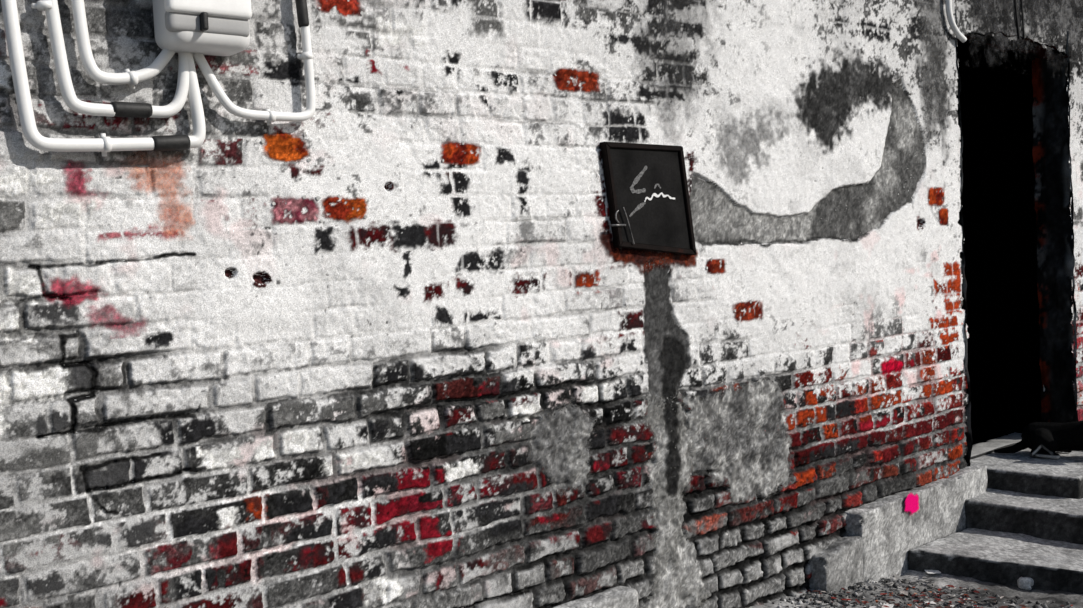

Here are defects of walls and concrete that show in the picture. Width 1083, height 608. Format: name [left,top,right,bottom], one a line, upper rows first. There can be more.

leakage [972,0,1083,65]
peeling [554,67,601,92]
leakage [718,111,783,182]
crack [28,252,196,302]
crack [4,332,129,438]
crack [162,412,196,420]
crack [80,453,207,514]